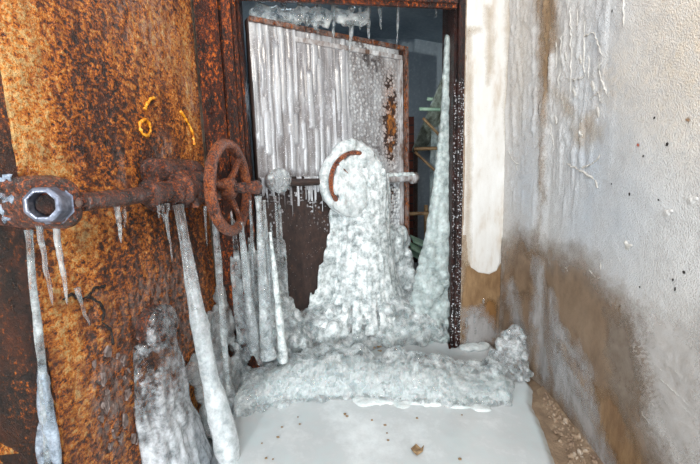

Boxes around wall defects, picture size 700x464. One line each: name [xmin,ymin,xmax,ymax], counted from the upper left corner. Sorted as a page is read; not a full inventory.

crack [62,284,115,345]
rust [92,345,132,423]
damp [461,238,661,464]
rust [108,406,139,452]